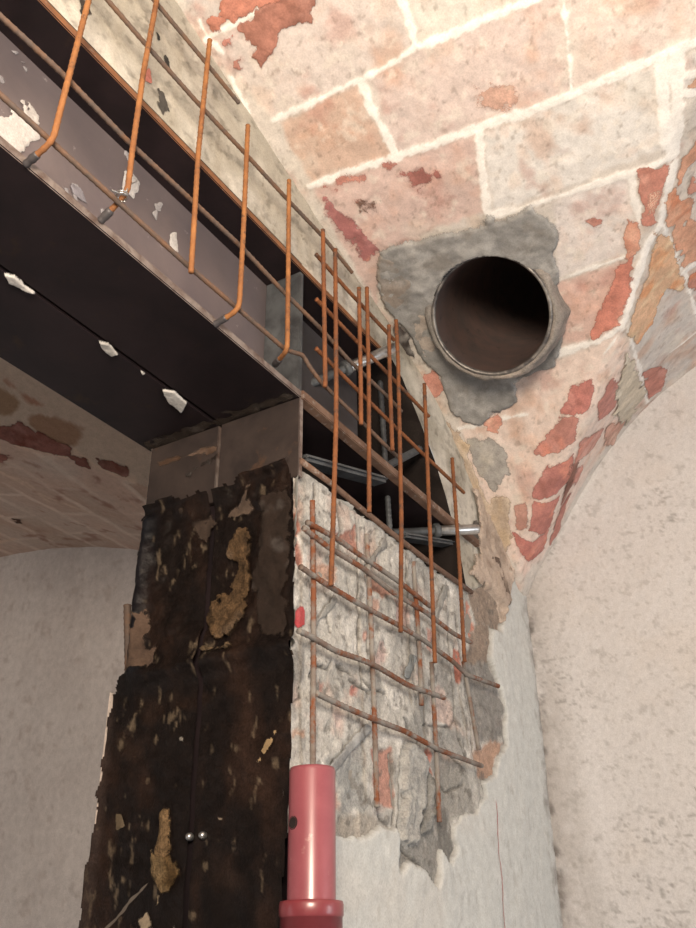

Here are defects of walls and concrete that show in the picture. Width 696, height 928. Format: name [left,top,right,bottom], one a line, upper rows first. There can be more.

peeling [590,141,696,344]
flaking render [0,0,505,883]
flaking render [512,378,625,562]
peeling [641,365,667,399]